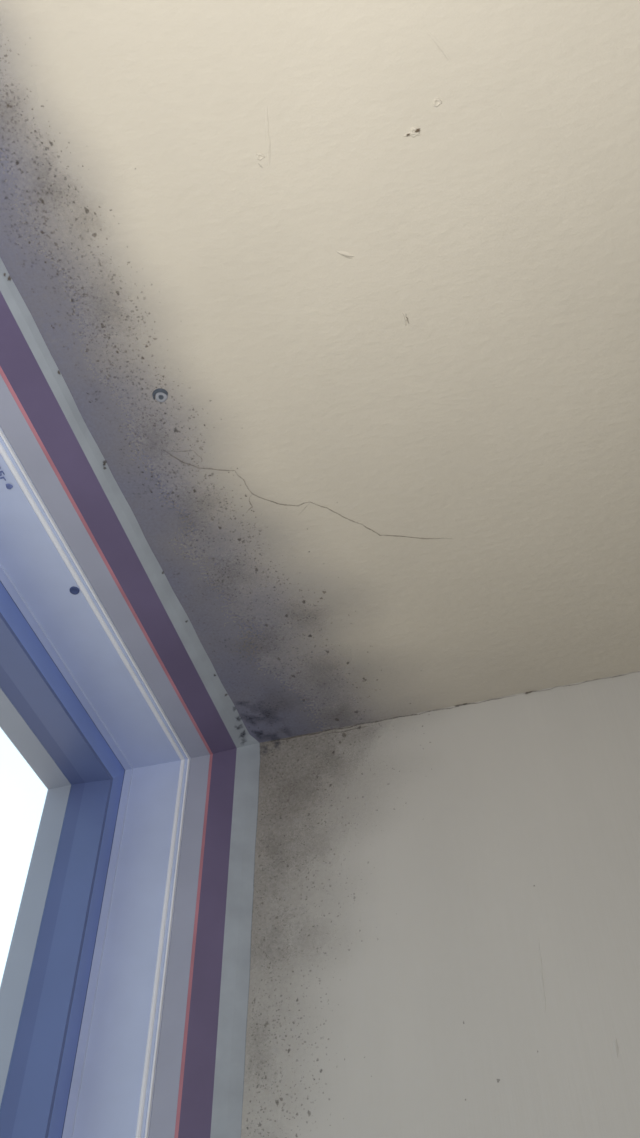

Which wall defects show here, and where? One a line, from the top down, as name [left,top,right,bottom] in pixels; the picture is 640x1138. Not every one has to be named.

water stain [0,126,361,819]